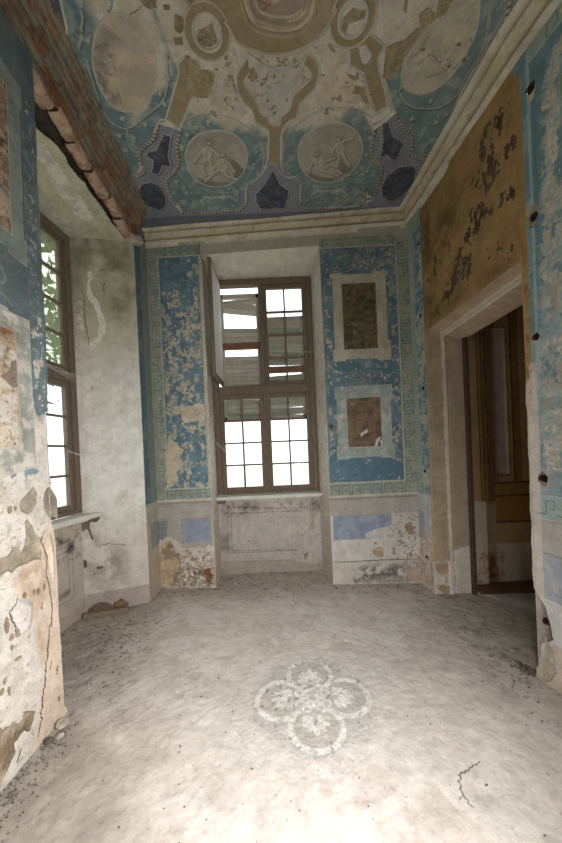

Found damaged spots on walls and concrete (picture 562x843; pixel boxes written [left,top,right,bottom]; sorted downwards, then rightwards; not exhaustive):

flaking render [140,0,184,45]
flaking render [184,48,315,117]
flaking render [313,0,452,114]
peeling [408,102,517,488]
peeling [31,317,46,406]
peeling [150,256,208,491]
flaking render [0,487,58,577]
flaking render [160,540,215,588]
flaking render [4,617,22,661]
crack [38,531,60,734]
flaking render [0,711,35,785]
crack [457,761,480,807]